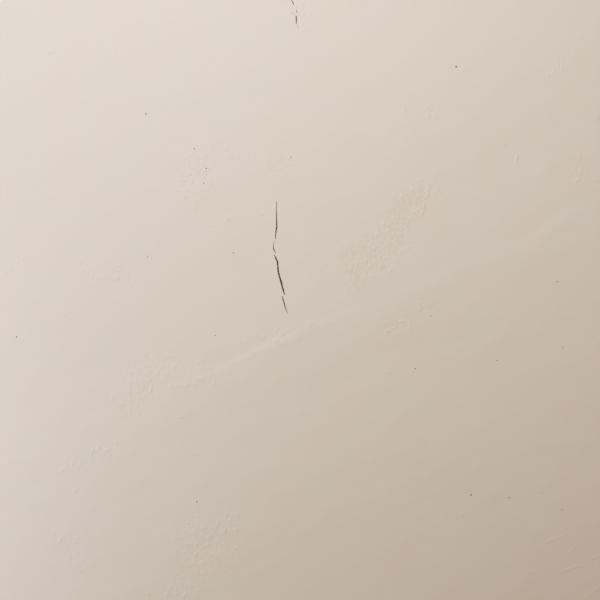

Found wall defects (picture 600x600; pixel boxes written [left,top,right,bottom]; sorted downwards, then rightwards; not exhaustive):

crack [273,201,288,314]